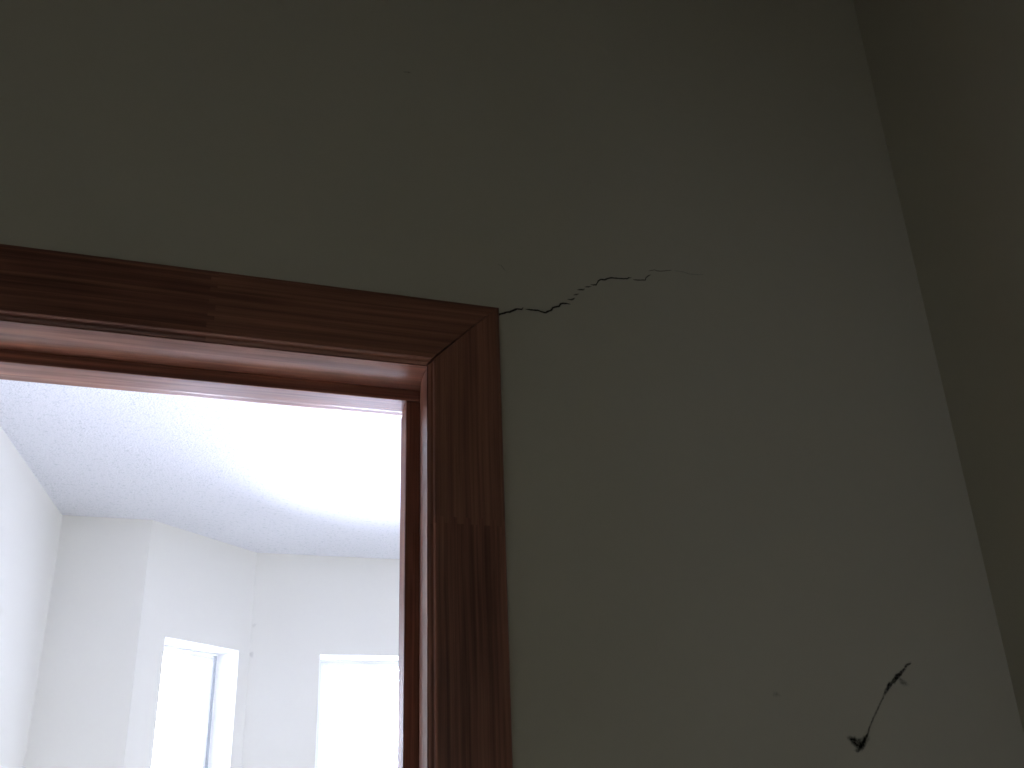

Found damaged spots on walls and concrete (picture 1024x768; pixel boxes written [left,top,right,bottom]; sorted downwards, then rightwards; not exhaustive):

crack [499,270,670,315]
crack [850,664,910,752]